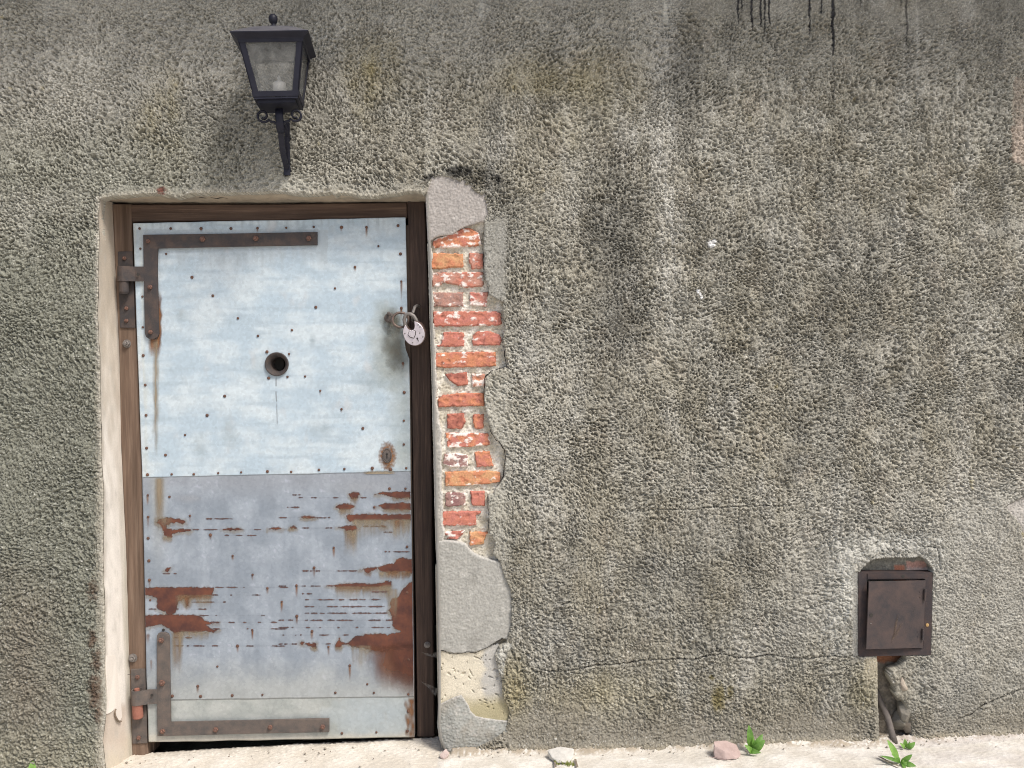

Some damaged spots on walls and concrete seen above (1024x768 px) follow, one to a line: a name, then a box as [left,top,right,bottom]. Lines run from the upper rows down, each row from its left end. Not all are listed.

leakage [759,0,771,32]
rust [150,300,162,425]
spalling [427,223,507,560]
rust [147,479,191,539]
rust [336,491,411,539]
rust [145,587,218,651]
rust [328,557,413,685]
peeling [441,642,509,721]